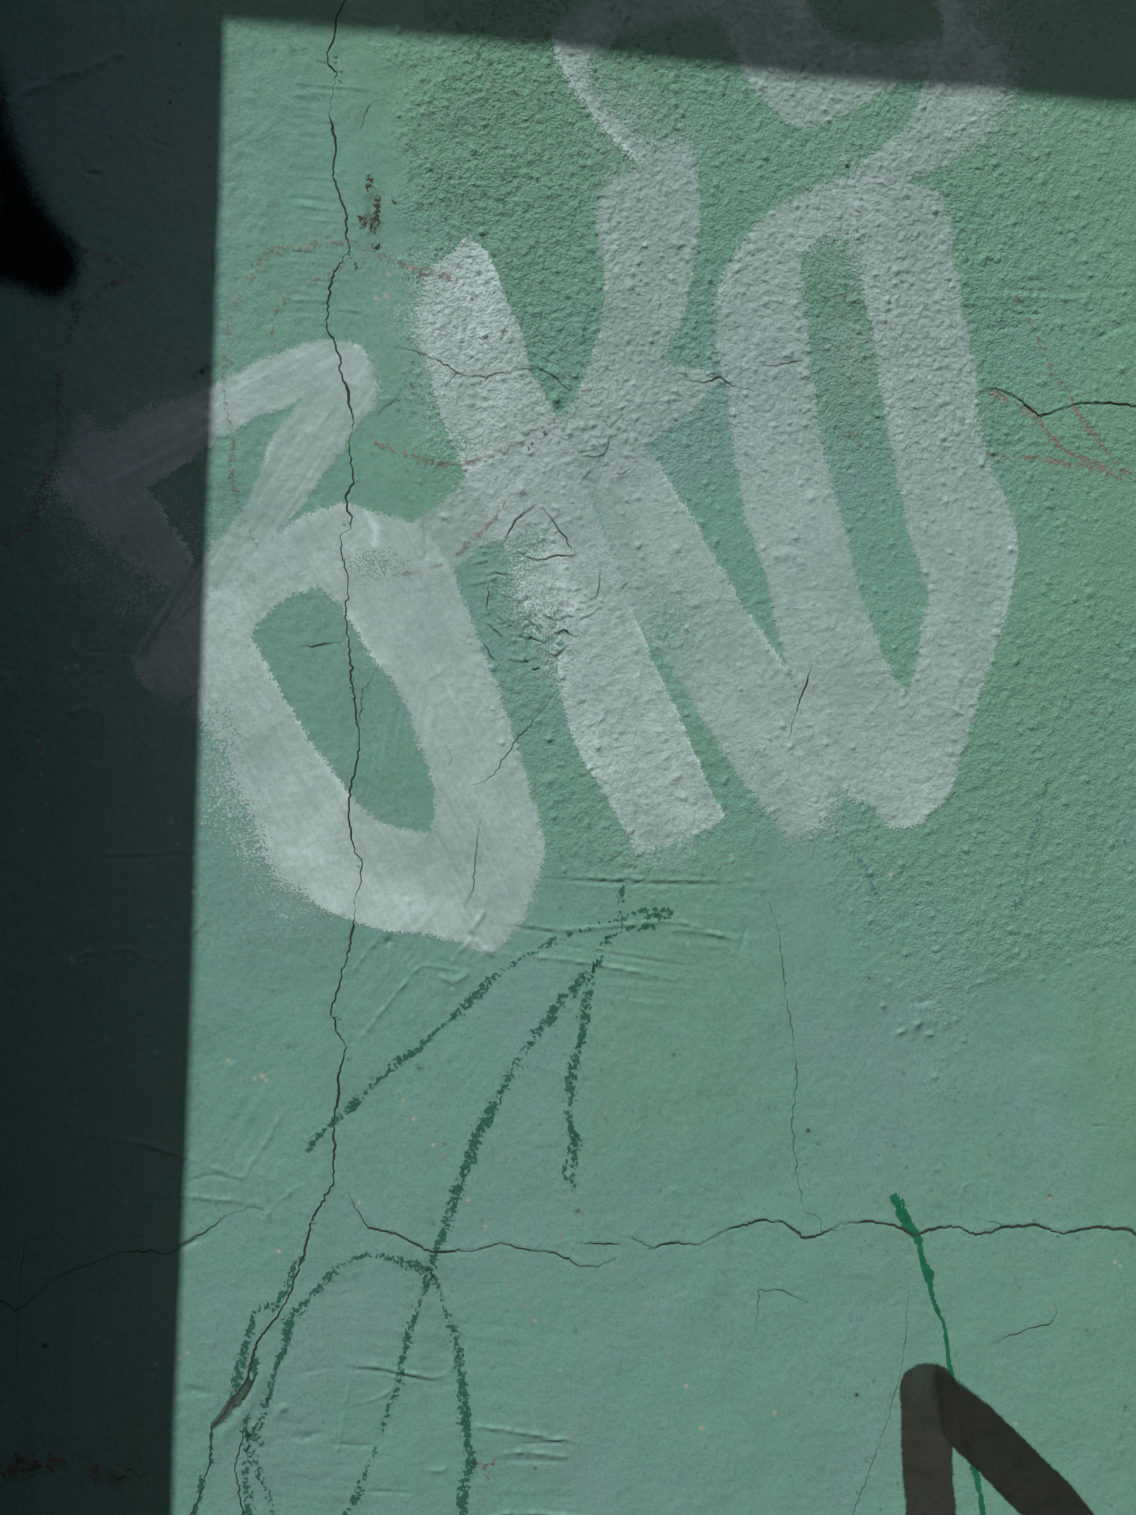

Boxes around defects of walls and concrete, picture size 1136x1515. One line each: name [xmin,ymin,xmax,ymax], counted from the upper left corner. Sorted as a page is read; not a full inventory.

crack [678,360,801,391]
crack [980,387,1136,416]
crack [789,665,812,738]
crack [189,0,618,1515]
crack [634,903,1136,1248]